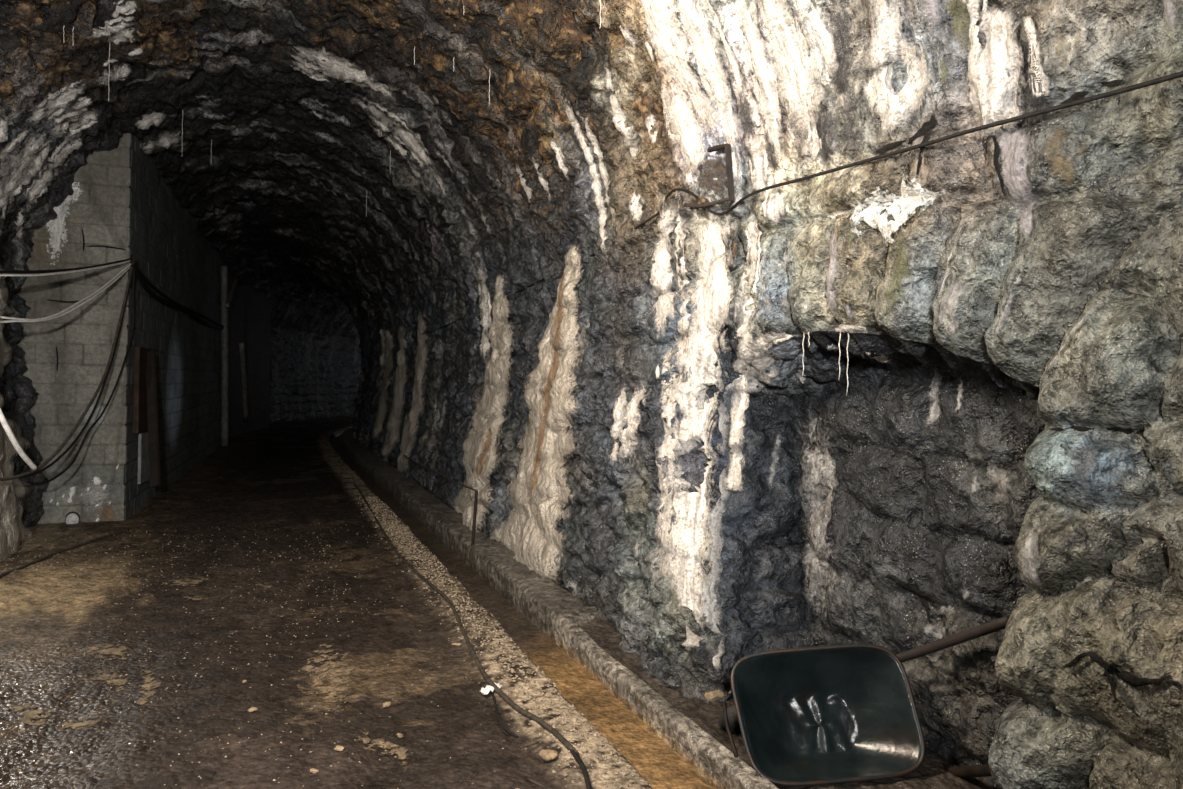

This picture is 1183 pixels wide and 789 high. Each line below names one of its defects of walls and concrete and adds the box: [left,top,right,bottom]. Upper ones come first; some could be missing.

damp [45,182,83,265]
damp [0,0,143,239]
damp [476,269,492,366]
rust [530,275,564,493]
damp [606,0,946,669]
damp [925,606,955,638]